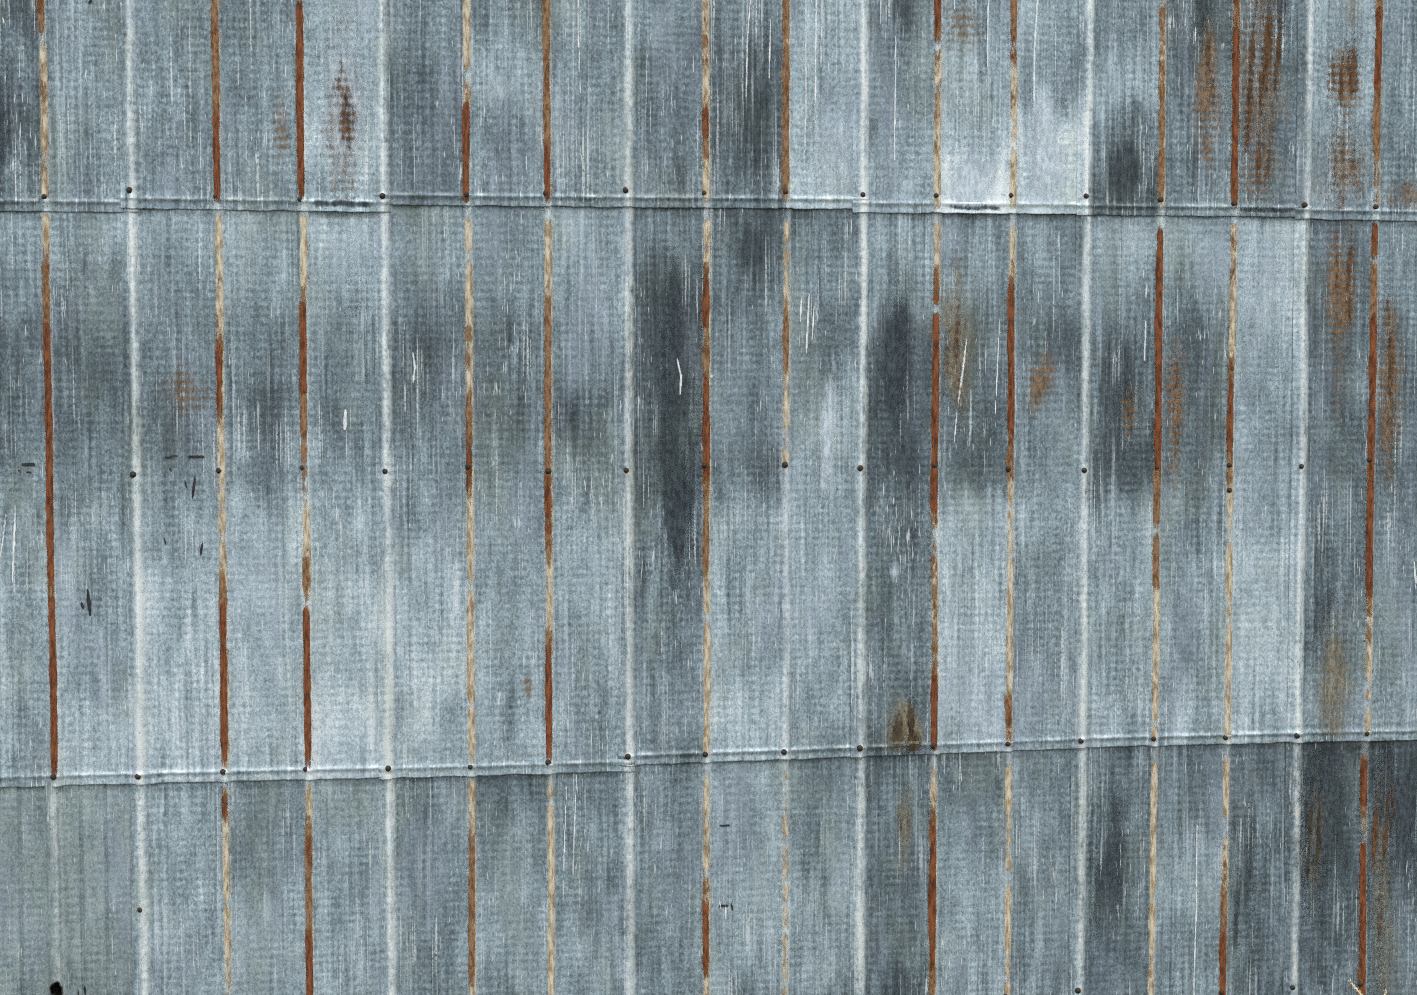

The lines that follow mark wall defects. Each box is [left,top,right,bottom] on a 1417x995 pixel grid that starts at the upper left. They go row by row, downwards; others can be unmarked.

rust [327,62,362,198]
rust [1321,0,1417,209]
leakage [660,272,693,560]
leakage [884,303,910,426]
rust [887,0,980,751]
rust [1321,222,1405,737]
rust [928,768,937,995]
rust [1357,755,1395,995]